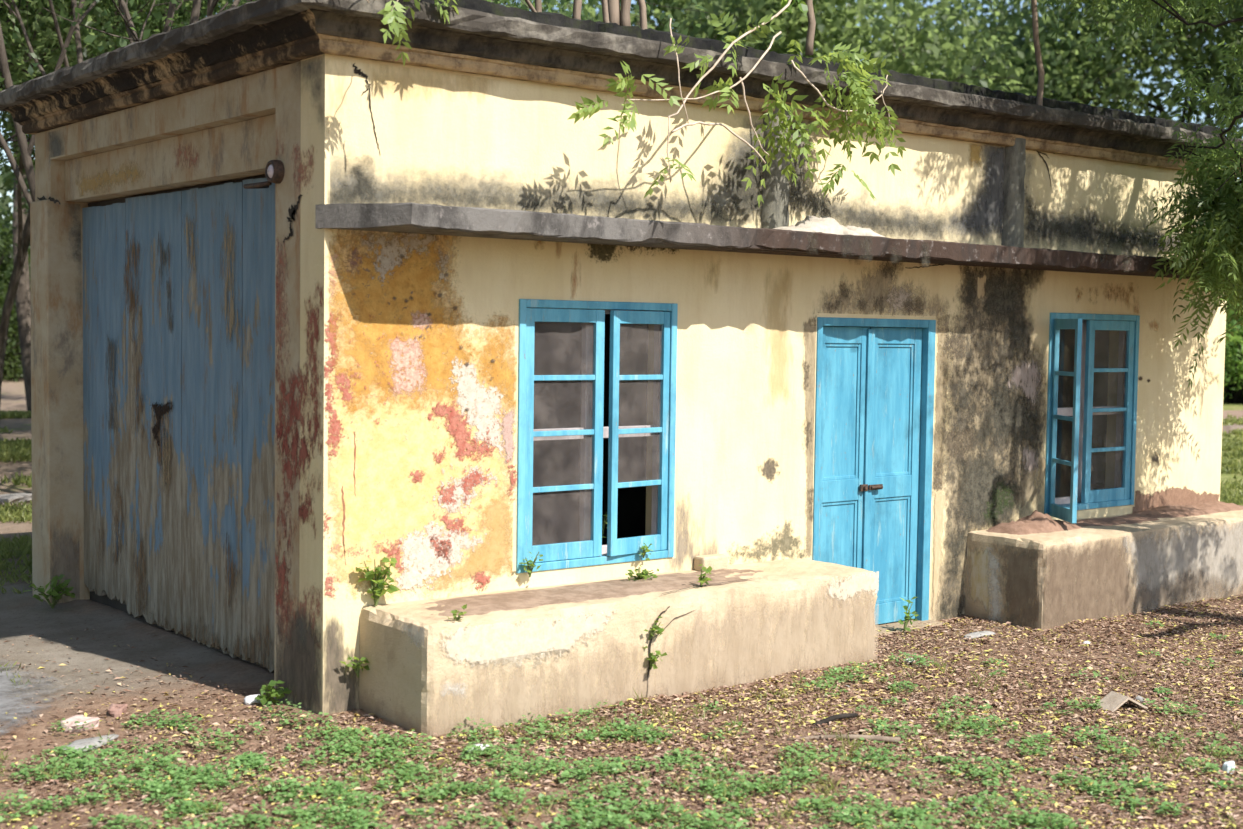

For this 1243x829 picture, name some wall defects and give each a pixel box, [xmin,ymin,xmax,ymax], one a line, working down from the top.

crack [353,63,380,151]
water stain [330,123,764,220]
water stain [585,244,679,262]
corrosion [106,230,144,435]
water stain [789,120,1223,628]
peeling [275,230,517,648]
water stain [758,458,779,481]
corrosion [98,484,273,669]
peeling [825,571,879,601]
peeling [433,607,619,669]